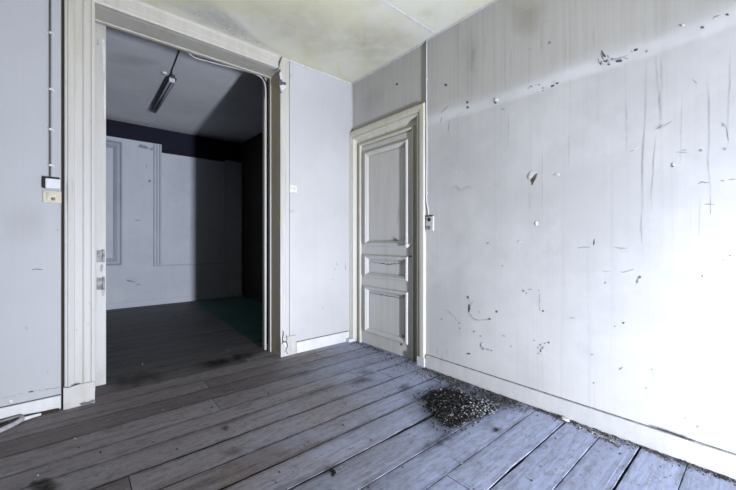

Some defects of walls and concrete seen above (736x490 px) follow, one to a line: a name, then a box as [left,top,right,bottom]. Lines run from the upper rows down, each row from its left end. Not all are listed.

spalling [597,49,648,65]